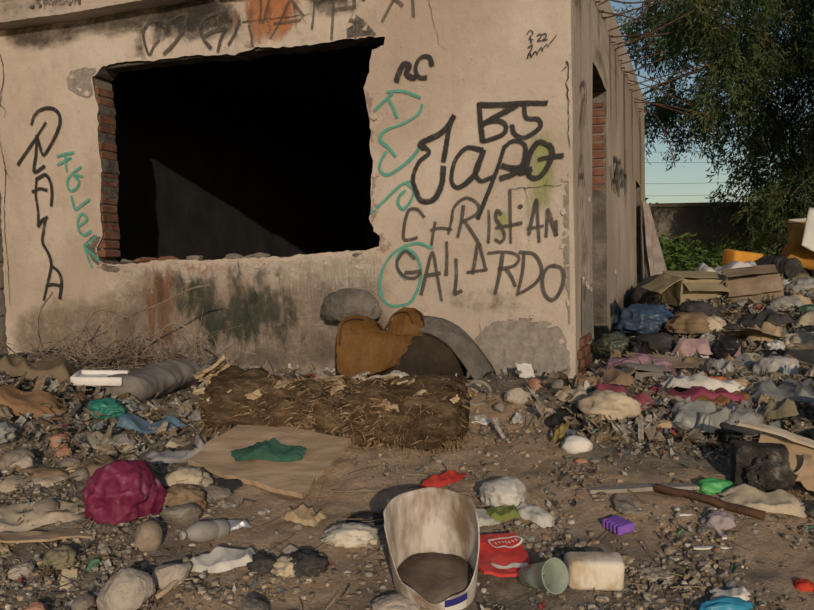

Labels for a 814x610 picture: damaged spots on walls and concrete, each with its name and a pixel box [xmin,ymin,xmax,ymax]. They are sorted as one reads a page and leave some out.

damp [18,278,340,369]